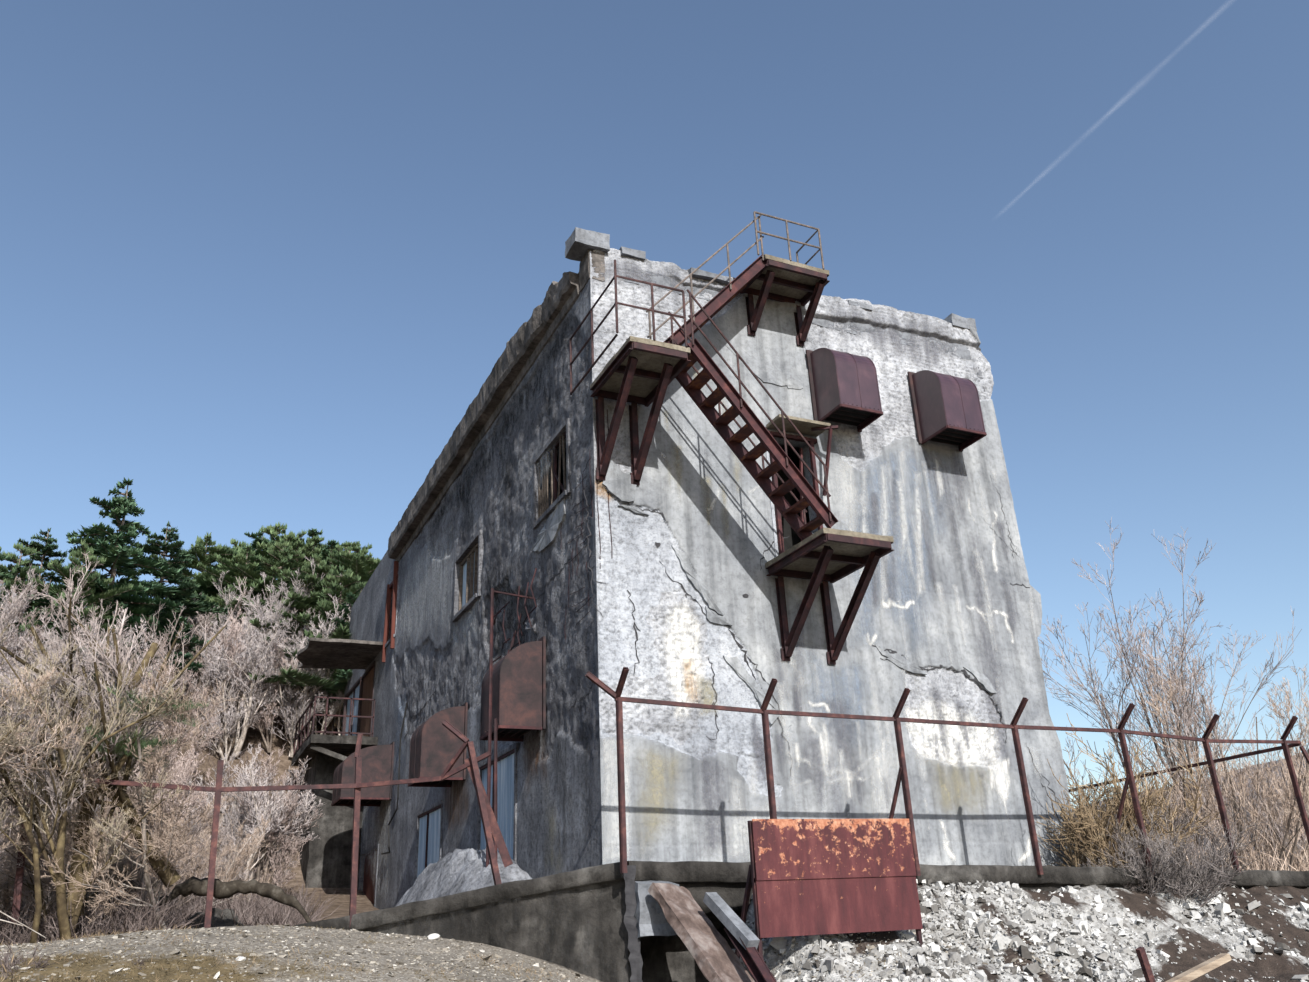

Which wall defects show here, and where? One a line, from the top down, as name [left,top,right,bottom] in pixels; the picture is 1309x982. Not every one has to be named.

spalling [717,295,994,471]
spalling [393,248,783,797]
crack [659,561,793,776]
spalling [875,645,1006,769]